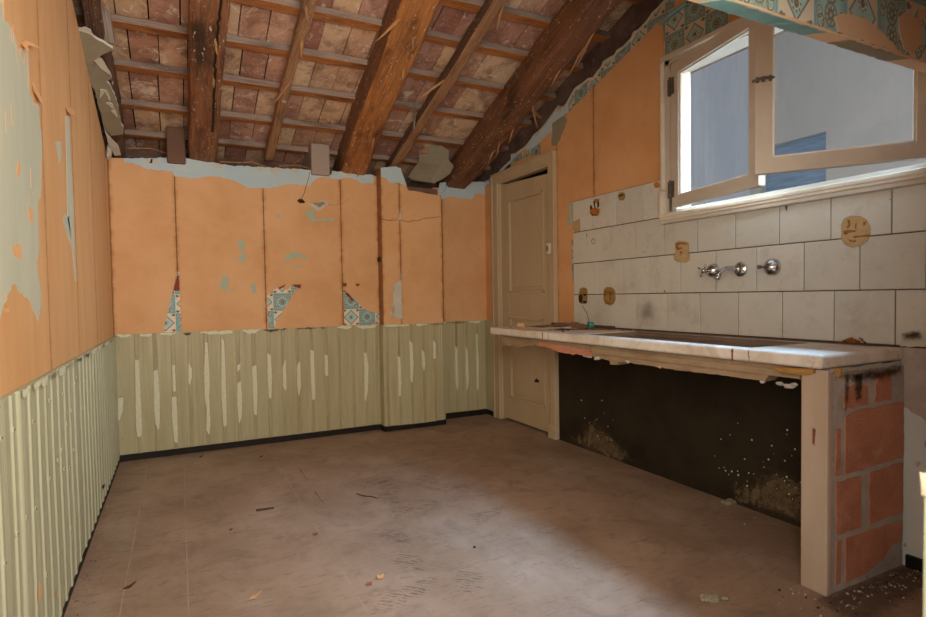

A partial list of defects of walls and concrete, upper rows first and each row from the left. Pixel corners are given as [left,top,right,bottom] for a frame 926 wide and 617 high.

peeling [834,9,926,54]
peeling [0,0,43,320]
peeling [55,107,77,282]
peeling [221,338,242,427]
peeling [252,353,272,415]
peeling [283,350,328,400]
peeling [398,340,436,397]
peeling [455,333,479,391]